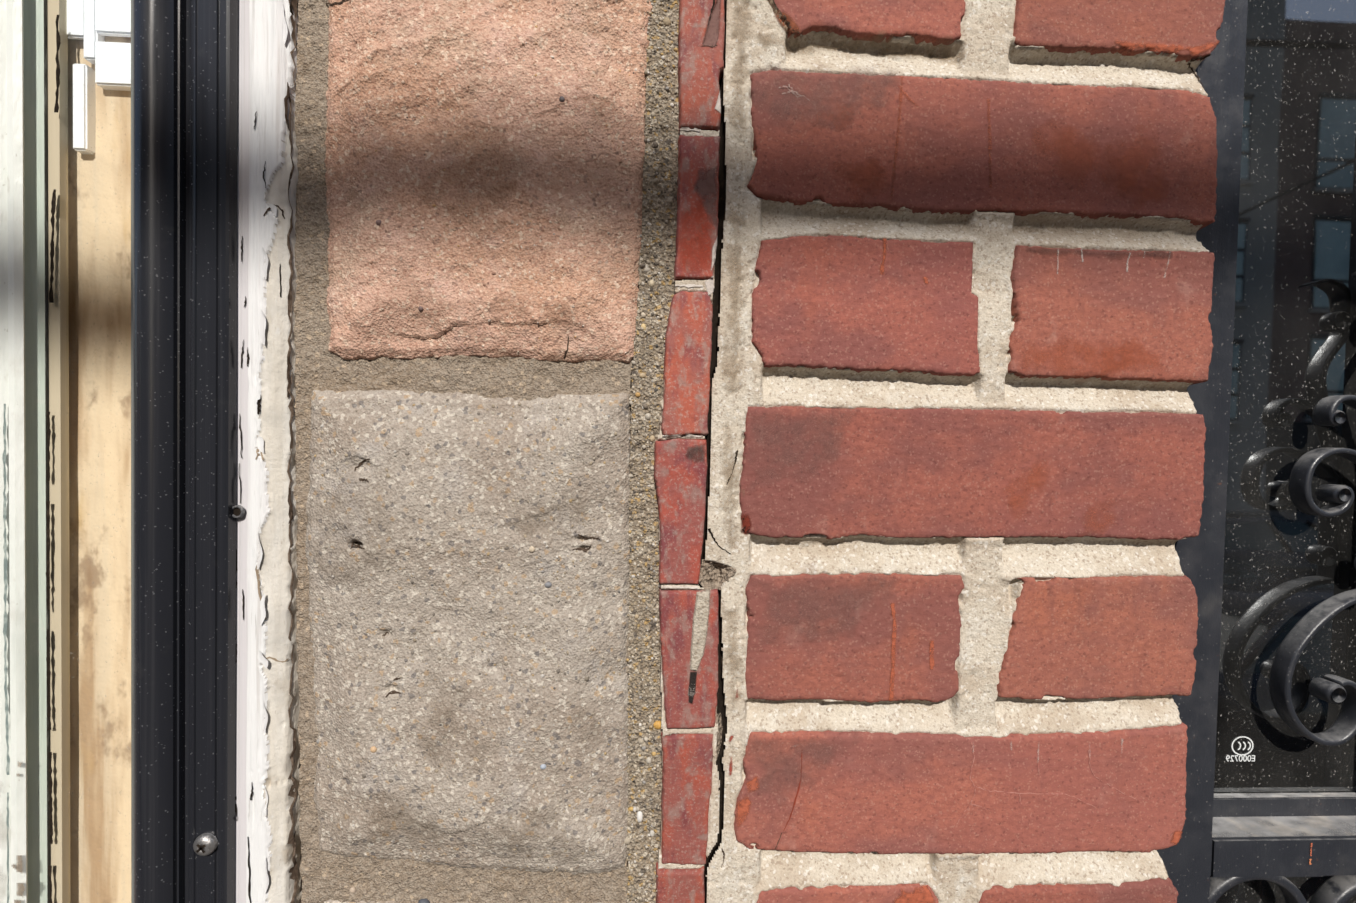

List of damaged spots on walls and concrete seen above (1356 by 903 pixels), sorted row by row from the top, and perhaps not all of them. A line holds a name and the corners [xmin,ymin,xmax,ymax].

peeling [283,0,299,45]
peeling [255,82,302,903]
crack [698,0,738,903]